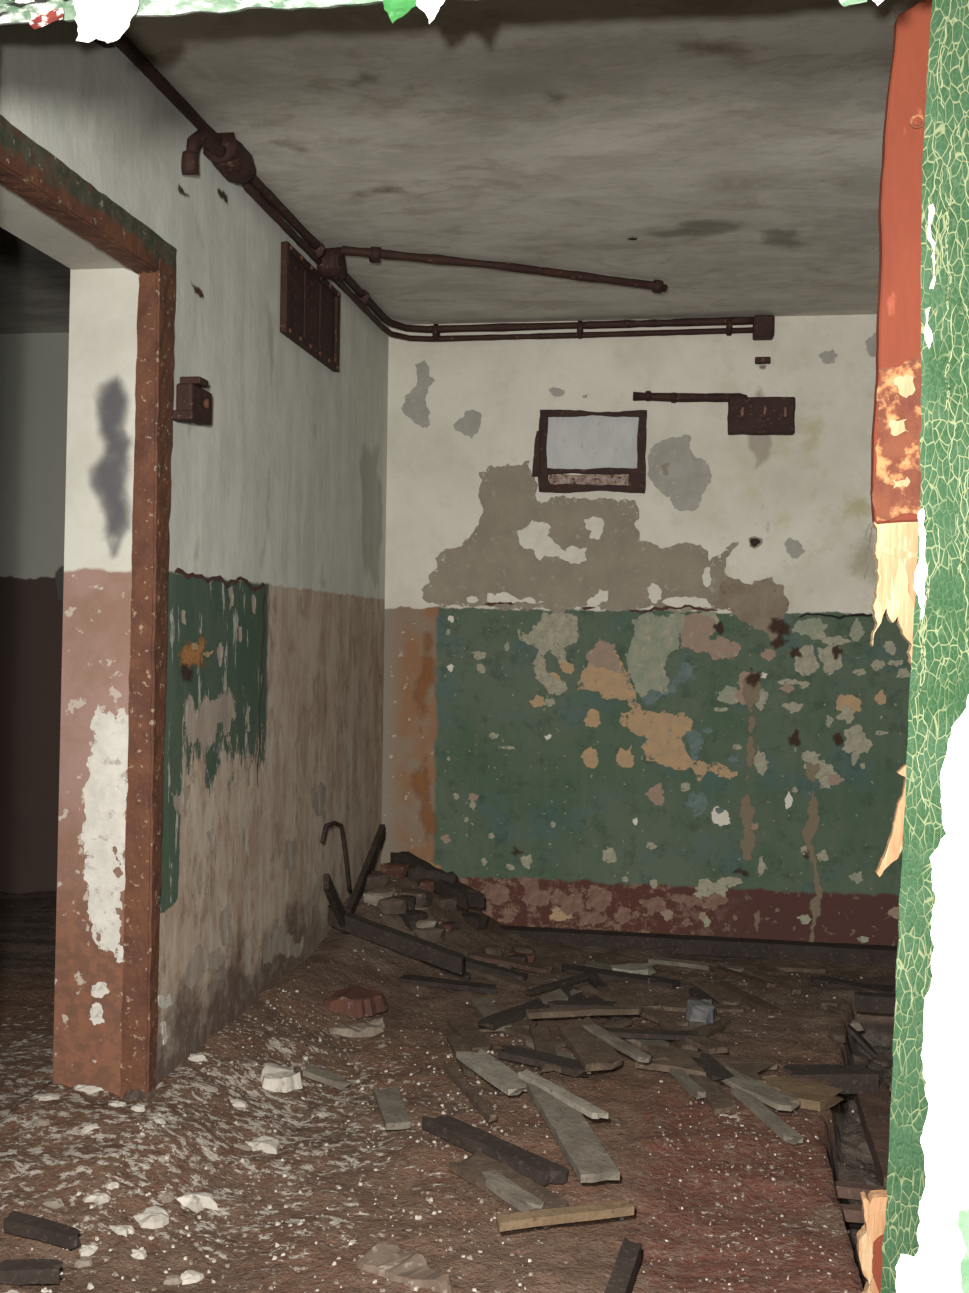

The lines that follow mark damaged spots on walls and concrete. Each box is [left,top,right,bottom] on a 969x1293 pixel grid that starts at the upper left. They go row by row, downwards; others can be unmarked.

peeling [15,0,139,43]
peeling [383,0,445,24]
peeling [927,204,936,289]
spalling [647,434,712,511]
peeling [865,308,932,620]
spalling [421,460,910,826]
peeling [171,687,250,815]
peeling [81,705,129,963]
peeling [474,854,743,927]
peeling [602,848,617,863]
peeling [89,982,109,1025]
peeling [158,994,172,1045]